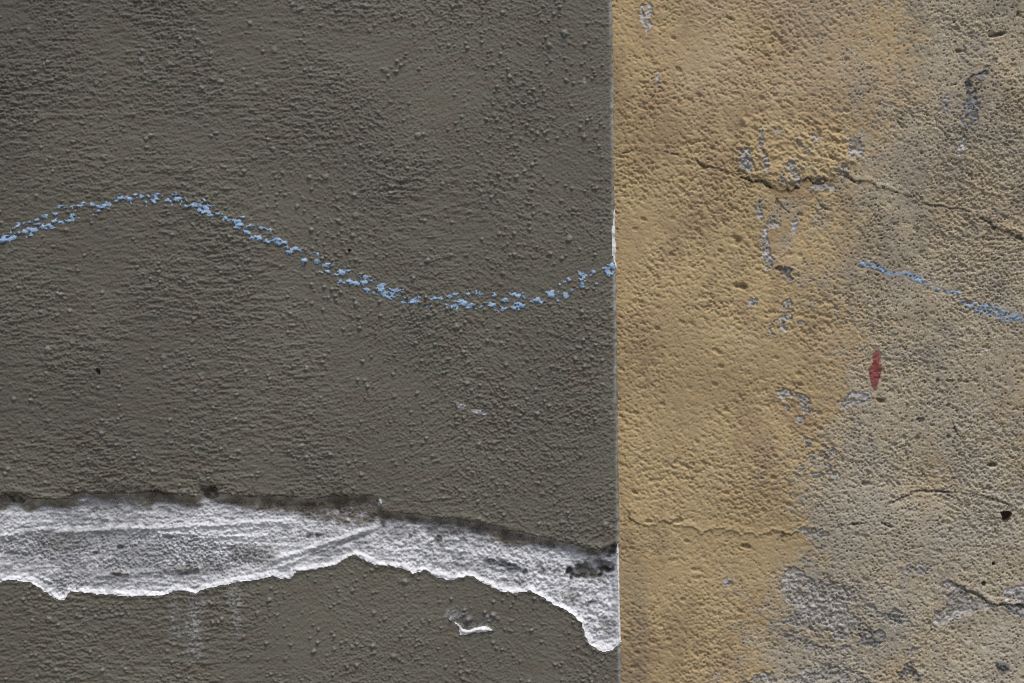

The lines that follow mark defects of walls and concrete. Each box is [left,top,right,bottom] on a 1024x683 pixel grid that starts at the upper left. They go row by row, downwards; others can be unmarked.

peeling [738,127,783,173]
peeling [786,136,864,191]
crack [664,151,1023,240]
peeling [757,200,799,281]
crack [851,489,961,528]
flaking render [0,486,622,652]
peeling [751,558,911,683]
crack [951,581,1008,606]